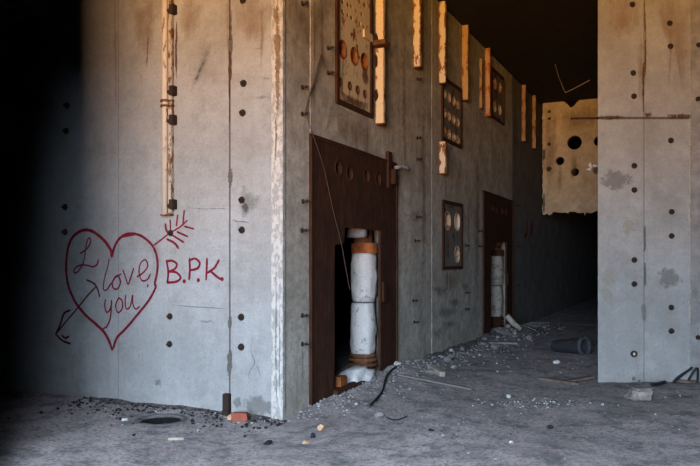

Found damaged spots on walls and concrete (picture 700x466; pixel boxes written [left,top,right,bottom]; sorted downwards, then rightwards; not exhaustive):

peeling [273,0,281,157]
rust [642,2,651,117]